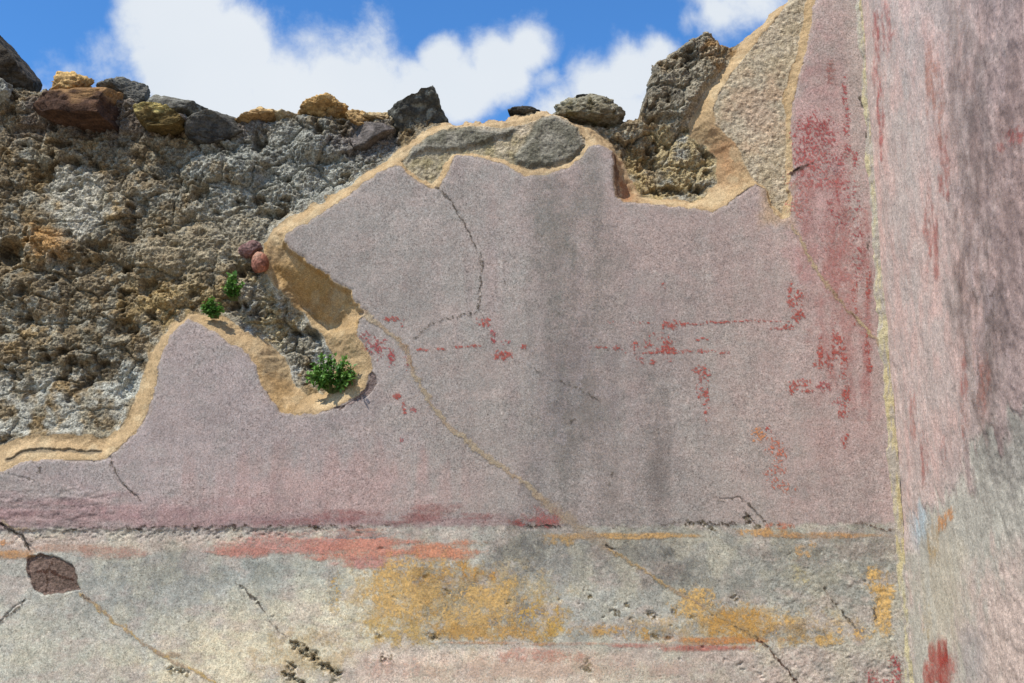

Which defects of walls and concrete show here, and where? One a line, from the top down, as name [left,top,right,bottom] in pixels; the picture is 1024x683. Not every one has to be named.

spalling [612,152,620,197]
spalling [333,372,377,410]
crack [360,186,798,683]
crack [106,458,153,531]
crack [0,520,33,550]
crack [183,523,281,531]
spalling [0,540,80,595]